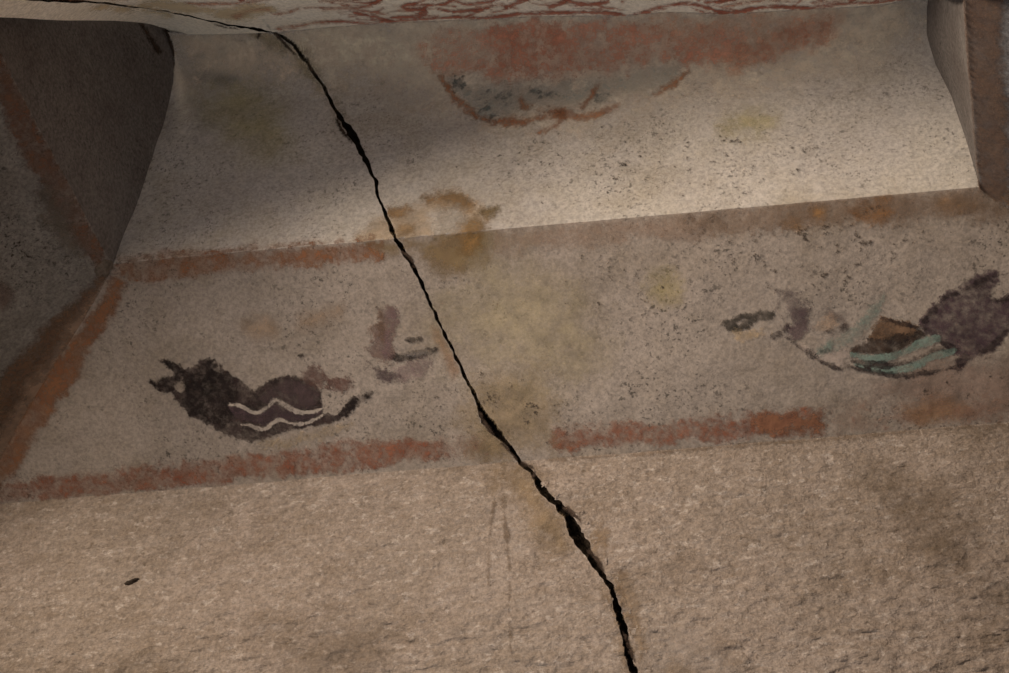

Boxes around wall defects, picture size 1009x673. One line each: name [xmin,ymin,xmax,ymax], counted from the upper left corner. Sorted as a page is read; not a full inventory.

crack [29,0,668,673]
damp [379,192,499,274]